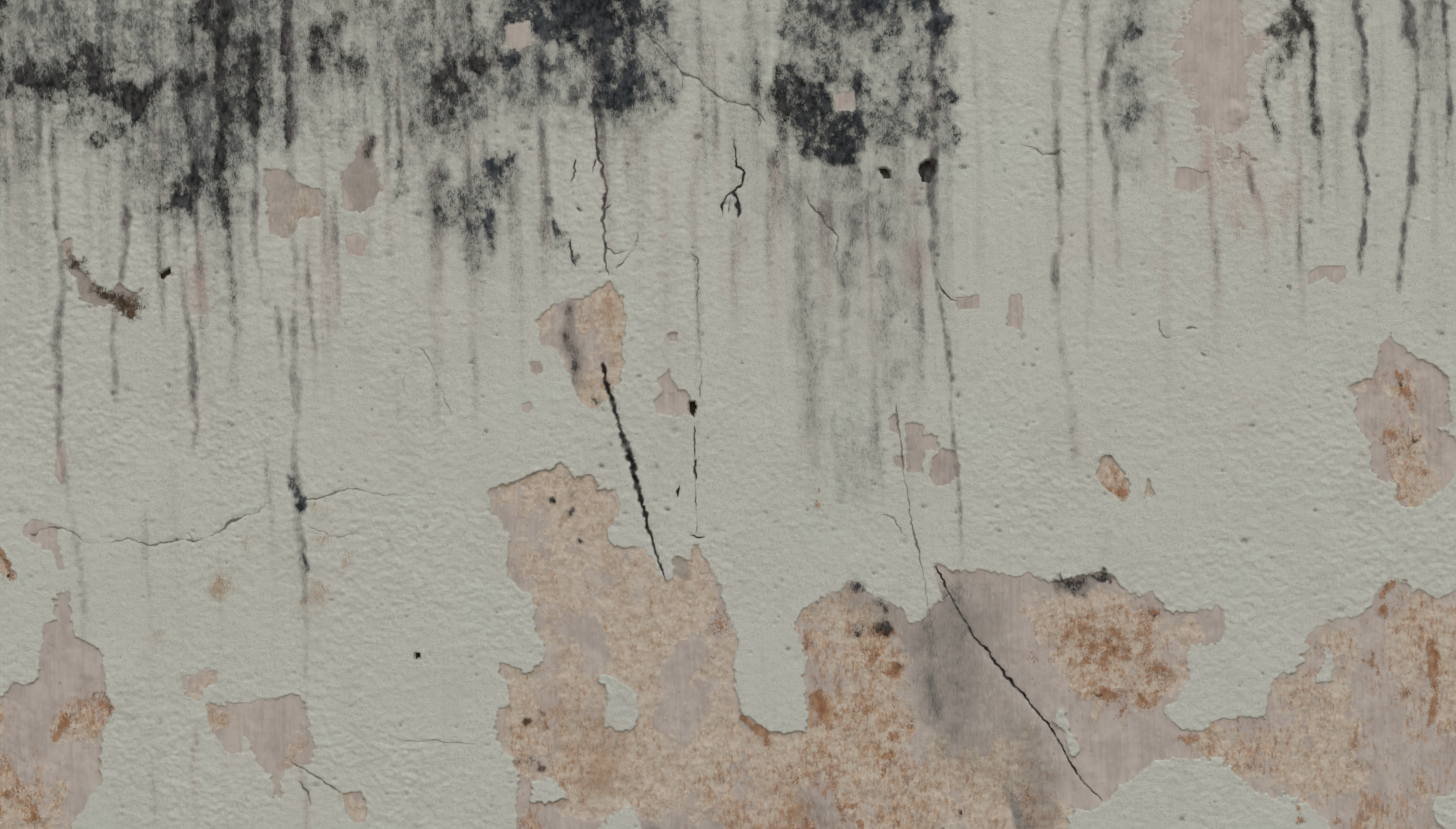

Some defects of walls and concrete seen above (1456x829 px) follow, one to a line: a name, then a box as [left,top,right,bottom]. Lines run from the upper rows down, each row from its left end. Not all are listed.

peeling [264,136,384,238]
water stain [0,0,678,327]
water stain [751,0,961,266]
water stain [1260,0,1325,186]
water stain [1353,0,1370,269]
water stain [1402,0,1448,191]
peeling [530,281,626,411]
crack [601,363,702,578]
peeling [1348,333,1456,507]
peeling [0,592,113,829]
peeling [488,456,1456,829]
crack [893,408,1102,800]